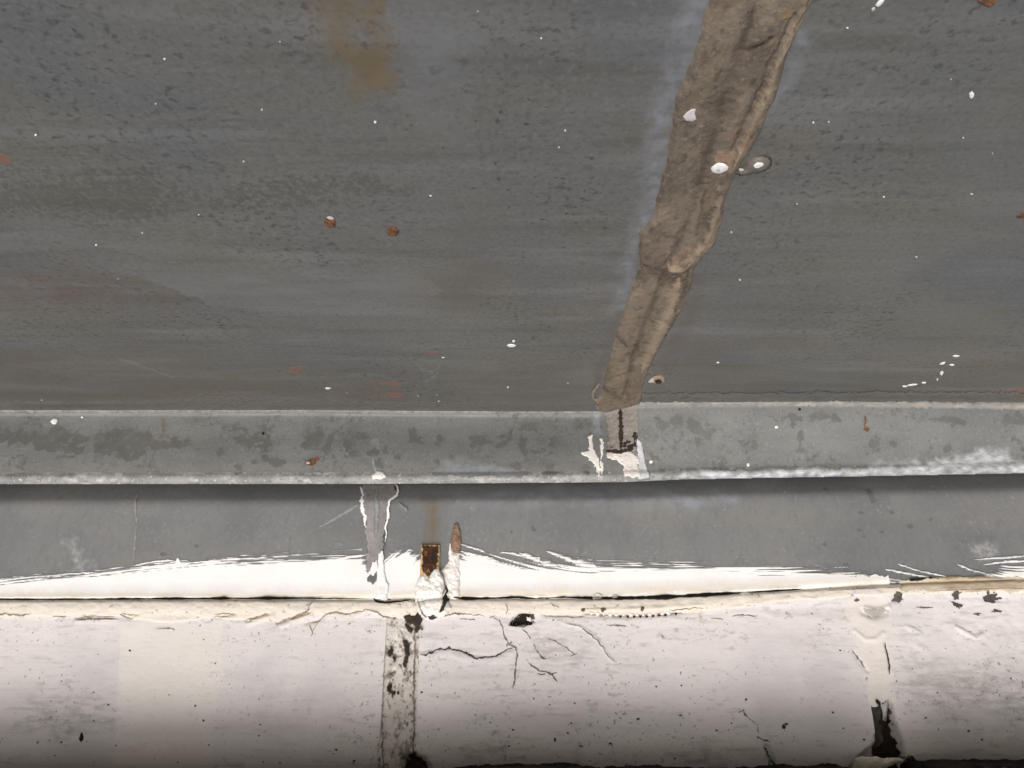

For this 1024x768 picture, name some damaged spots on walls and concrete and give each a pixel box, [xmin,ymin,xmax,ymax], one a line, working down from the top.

water stain [0,0,1024,522]
water stain [202,612,413,766]
crack [0,570,800,765]
water stain [405,752,428,768]
spalling [853,699,904,768]